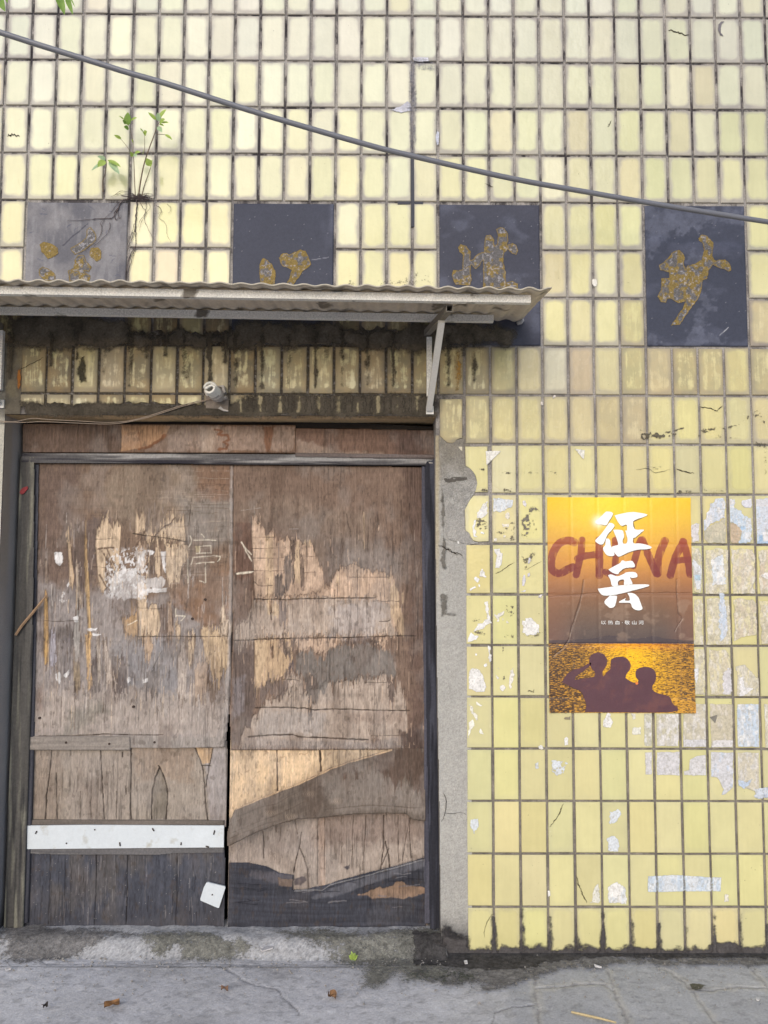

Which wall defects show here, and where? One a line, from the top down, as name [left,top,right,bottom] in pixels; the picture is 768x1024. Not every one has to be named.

leakage [5,315,518,419]
spalling [439,436,515,544]
leakage [441,909,768,956]